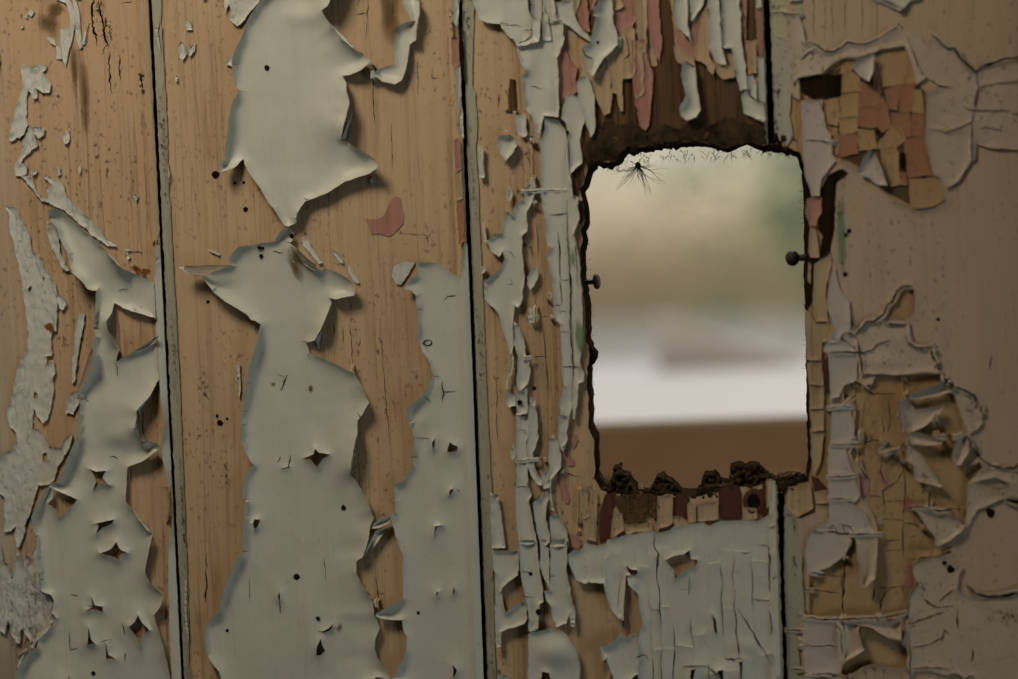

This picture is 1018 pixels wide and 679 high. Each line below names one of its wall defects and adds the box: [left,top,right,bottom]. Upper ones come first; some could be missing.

crack [500,0,562,45]
crack [928,0,1018,160]
peeling [0,0,781,679]
crack [636,283,1018,679]
peeling [770,0,1018,679]